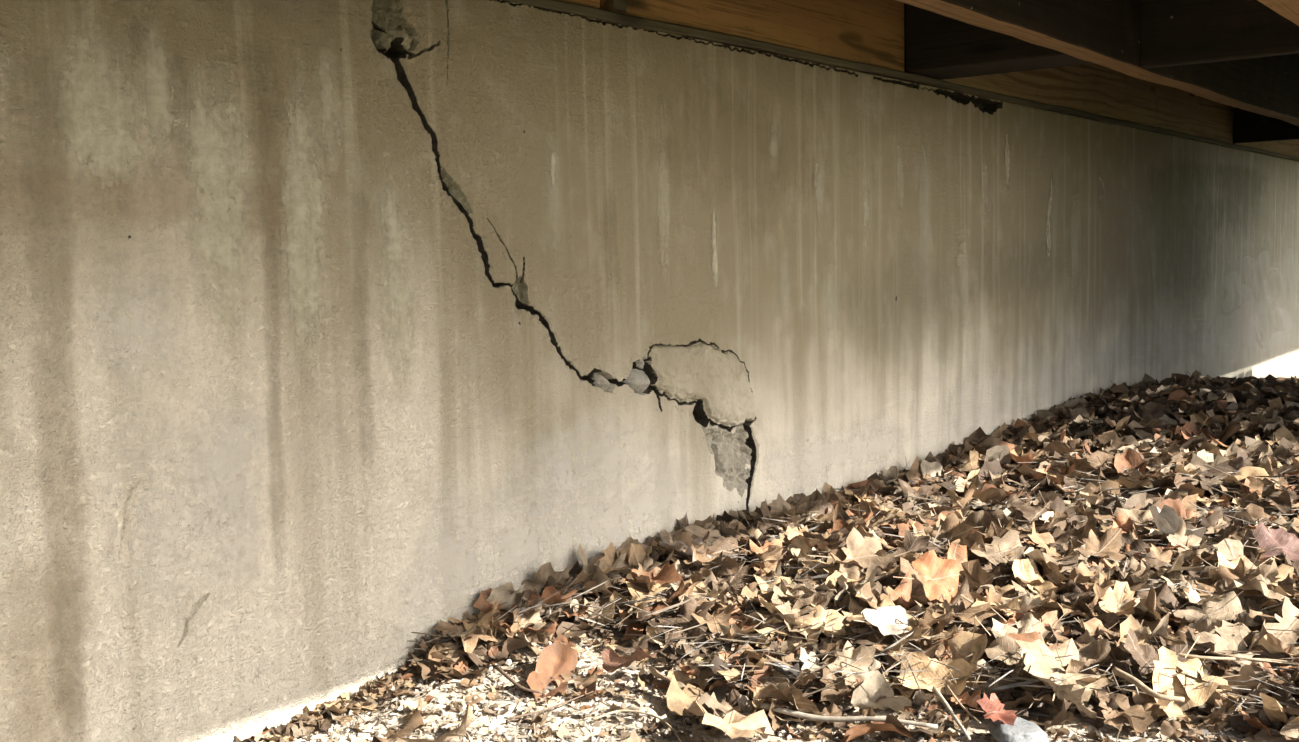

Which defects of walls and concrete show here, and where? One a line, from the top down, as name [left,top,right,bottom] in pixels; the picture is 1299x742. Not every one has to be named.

leakage [58,44,132,178]
leakage [145,48,171,132]
spalling [370,0,444,64]
spalling [464,0,1004,119]
leakage [191,100,242,305]
leakage [283,109,321,335]
crack [360,0,628,393]
spalling [698,422,752,505]
crack [738,419,766,513]